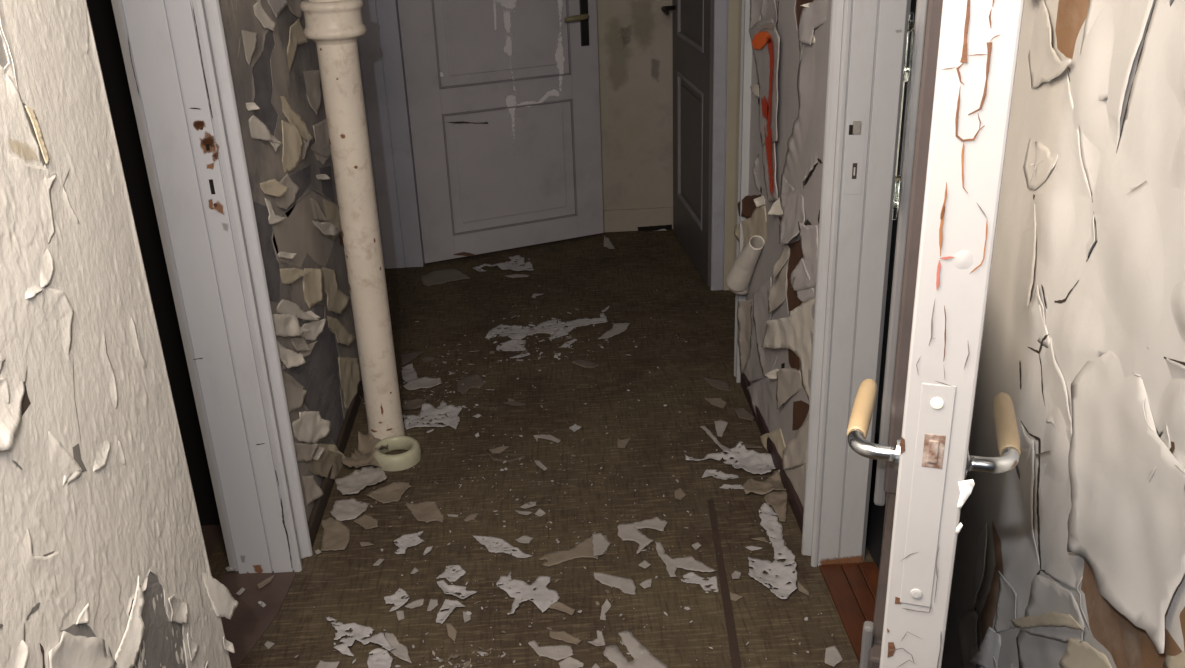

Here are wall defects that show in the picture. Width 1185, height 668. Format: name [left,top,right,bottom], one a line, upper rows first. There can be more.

corrosion [194,121,219,169]
peeling [1028,0,1109,202]
peeling [1107,0,1185,190]
peeling [0,0,126,486]
peeling [129,316,147,371]
peeling [221,0,388,554]
peeling [685,0,828,599]
peeling [14,569,208,668]
peeling [223,637,235,653]
peeling [202,565,276,620]
peeling [316,565,477,668]
peeling [956,350,1185,668]